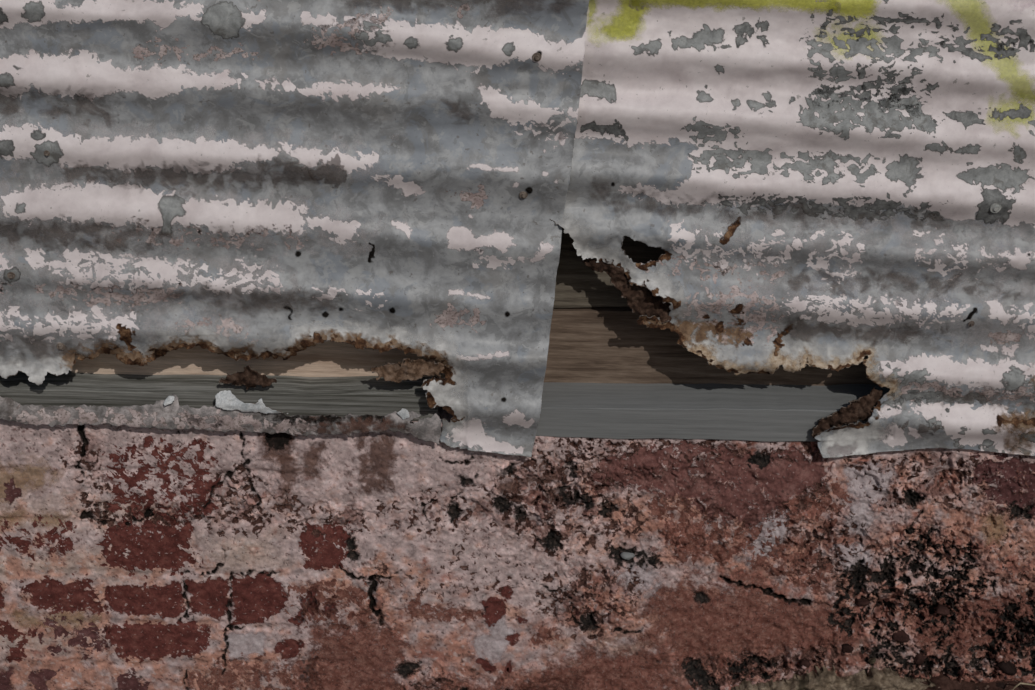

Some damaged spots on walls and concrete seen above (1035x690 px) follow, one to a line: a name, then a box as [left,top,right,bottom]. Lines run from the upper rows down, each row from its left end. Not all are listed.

peeling [0,0,401,102]
peeling [299,0,1035,346]
peeling [0,122,426,344]
rust [569,247,794,374]
rust [62,323,465,423]
rust [799,350,893,438]
damp [559,460,618,518]
crack [179,549,276,675]
crack [339,565,398,625]
damp [606,542,663,598]
crack [719,575,811,605]
damp [822,409,1035,681]